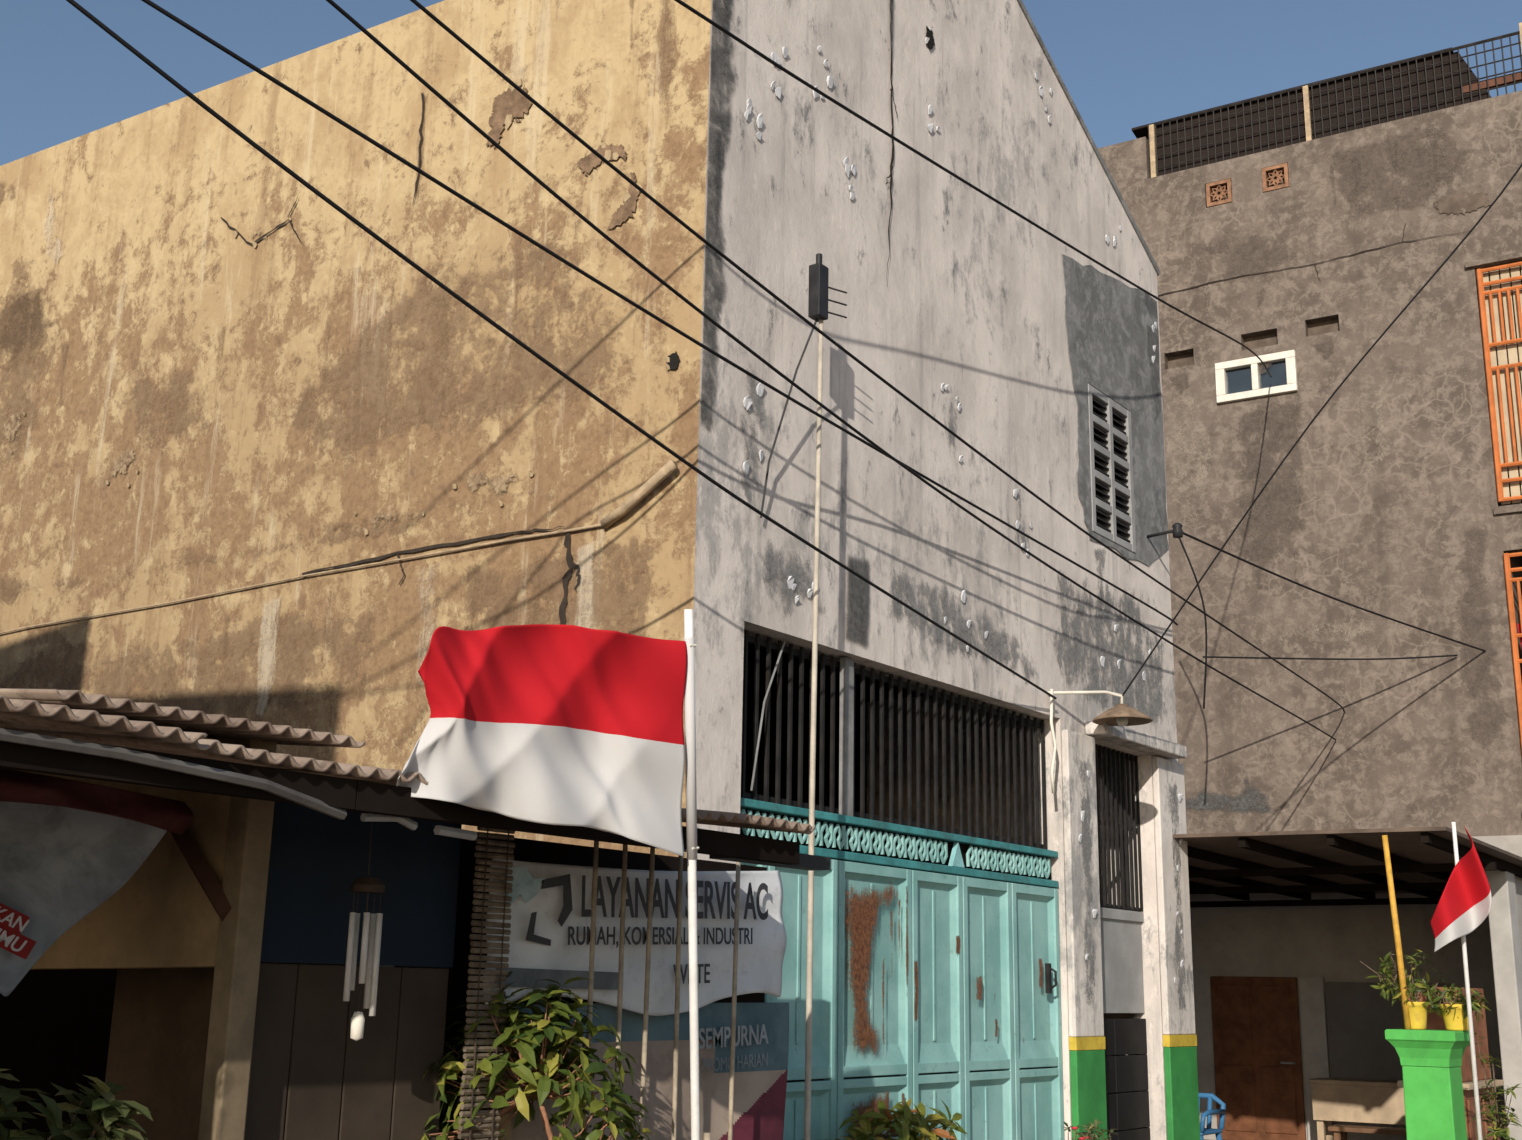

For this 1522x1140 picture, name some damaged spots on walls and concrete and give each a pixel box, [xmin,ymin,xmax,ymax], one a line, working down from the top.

crack [221,196,302,245]
spalling [486,77,532,149]
spalling [576,140,643,230]
water stain [700,0,737,430]
crack [886,0,898,287]
rust [845,885,918,1054]